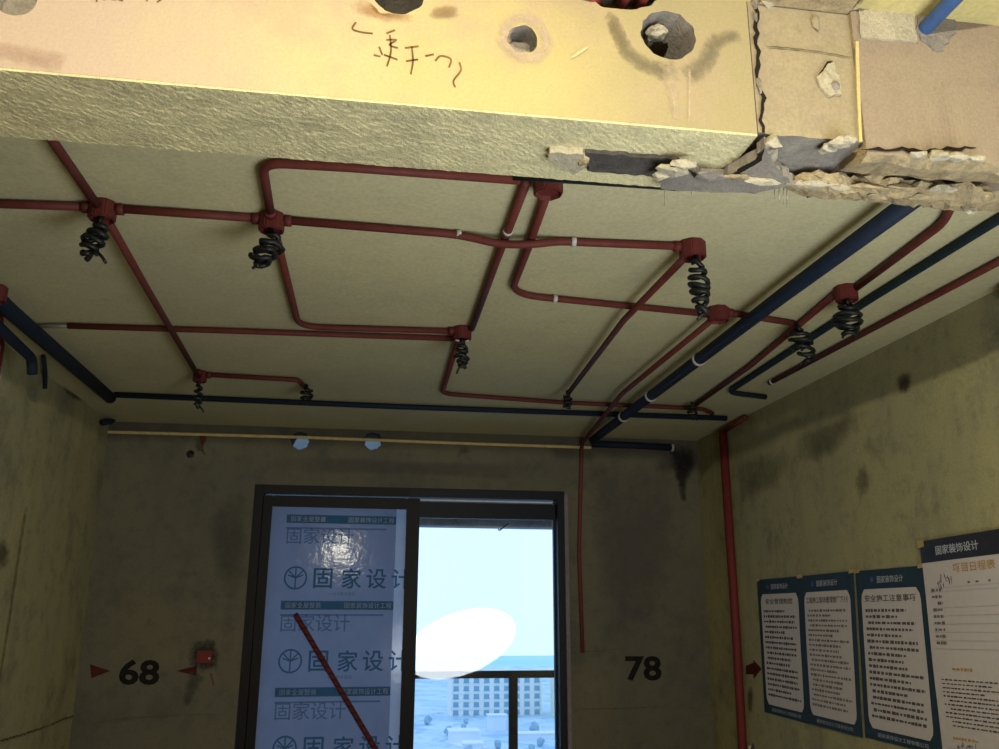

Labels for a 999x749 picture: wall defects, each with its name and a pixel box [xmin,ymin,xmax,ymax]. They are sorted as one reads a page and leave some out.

crack [730,0,849,180]
spalling [548,133,996,215]
damp [673,450,693,499]